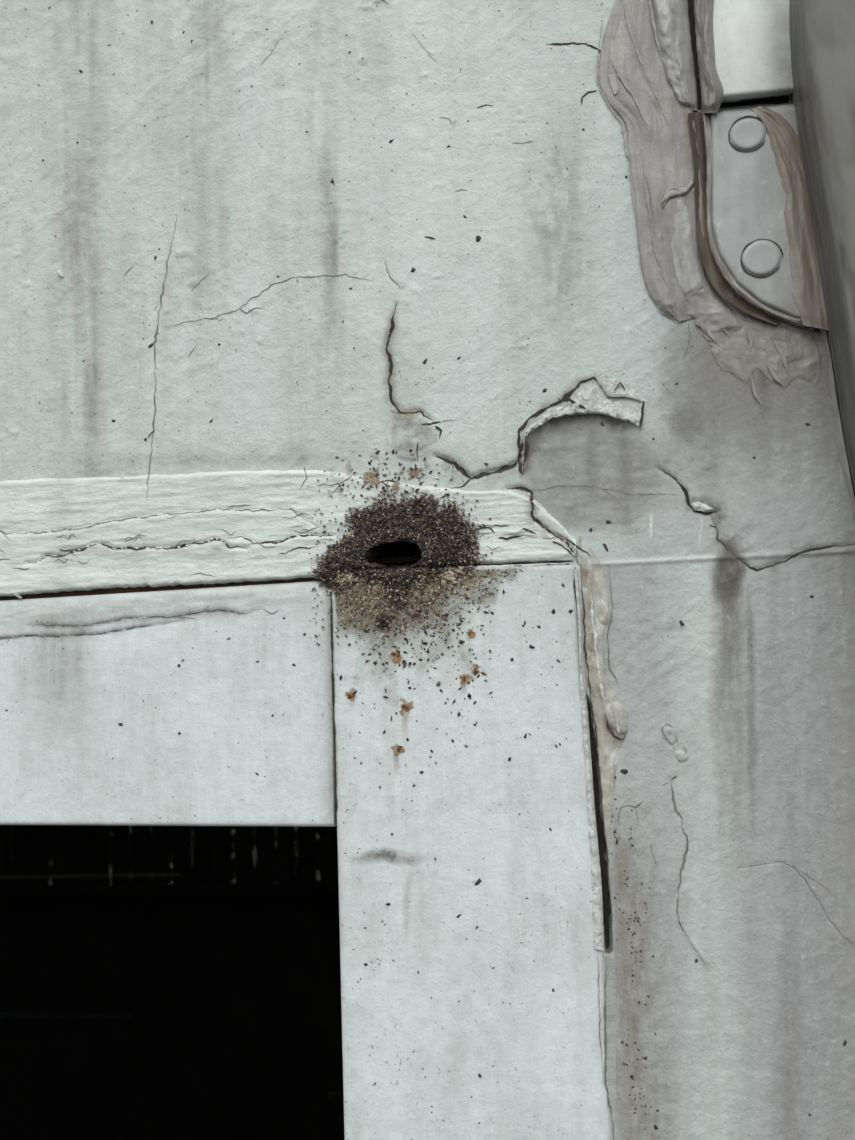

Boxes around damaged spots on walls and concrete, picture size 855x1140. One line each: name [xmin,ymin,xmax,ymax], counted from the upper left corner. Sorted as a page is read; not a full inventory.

peeling [517,373,648,474]
crack [0,218,681,768]
spalling [331,540,466,589]
crack [709,515,854,571]
crack [618,776,689,931]